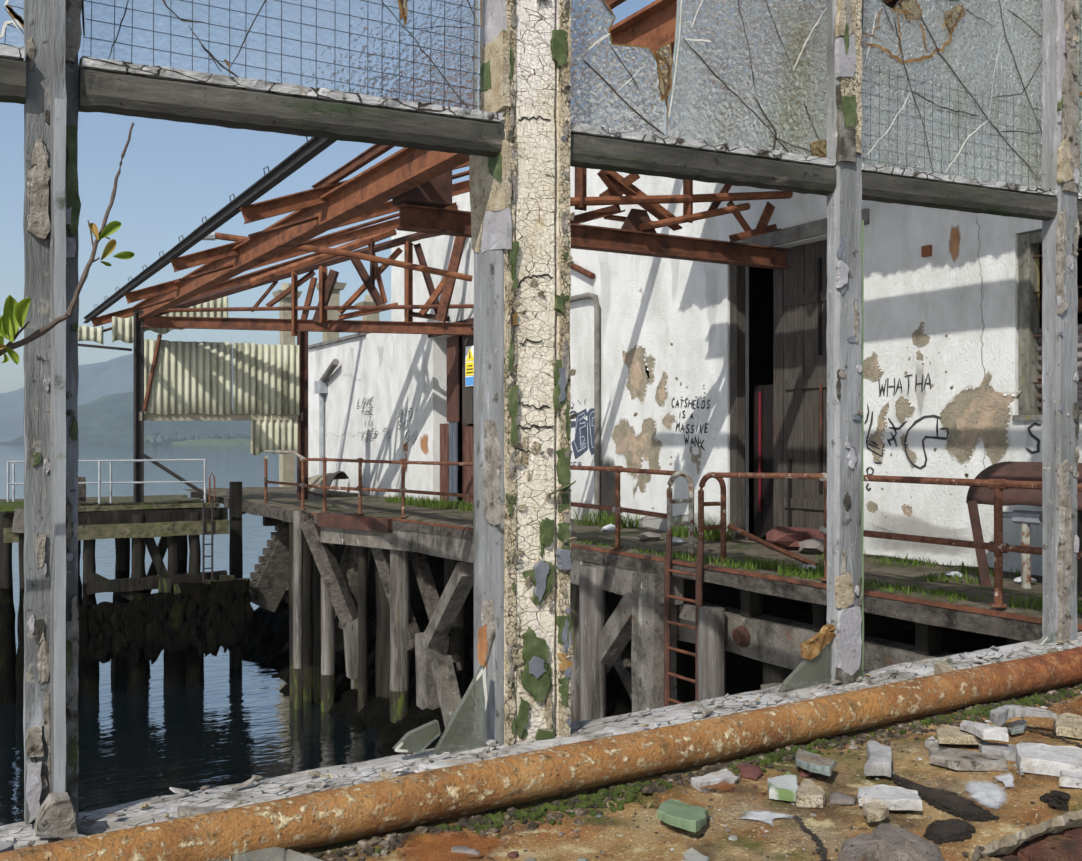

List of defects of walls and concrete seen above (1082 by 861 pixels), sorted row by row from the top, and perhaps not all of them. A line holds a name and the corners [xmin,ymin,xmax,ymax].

crack [162,0,266,78]
crack [574,0,665,135]
crack [683,0,826,158]
crack [865,0,1043,177]
peeling [904,321,939,375]
crack [516,402,553,453]
peeling [611,344,706,497]
peeling [868,395,918,473]
peeling [933,370,1022,478]
peeling [814,549,1036,697]
rust [702,781,734,789]
rust [404,833,500,861]